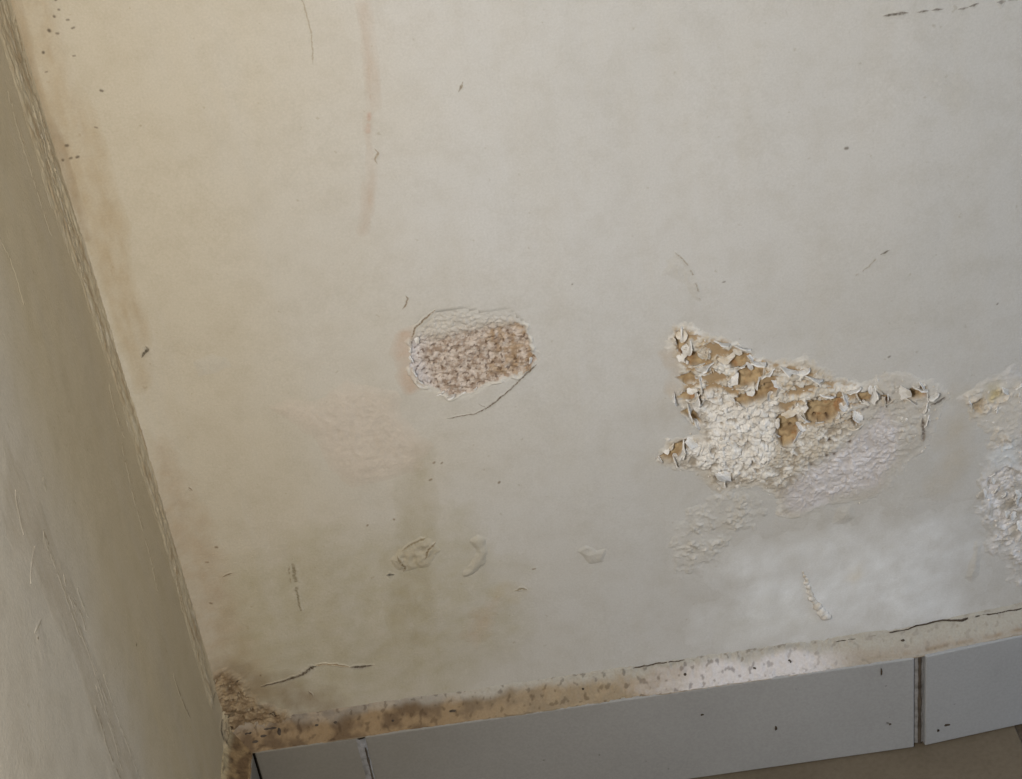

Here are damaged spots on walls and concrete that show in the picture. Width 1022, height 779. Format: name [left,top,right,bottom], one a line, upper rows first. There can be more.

spalling [404,308,541,402]
crack [445,364,537,419]
spalling [654,321,1022,587]
peeling [386,536,442,579]
crack [260,662,375,696]